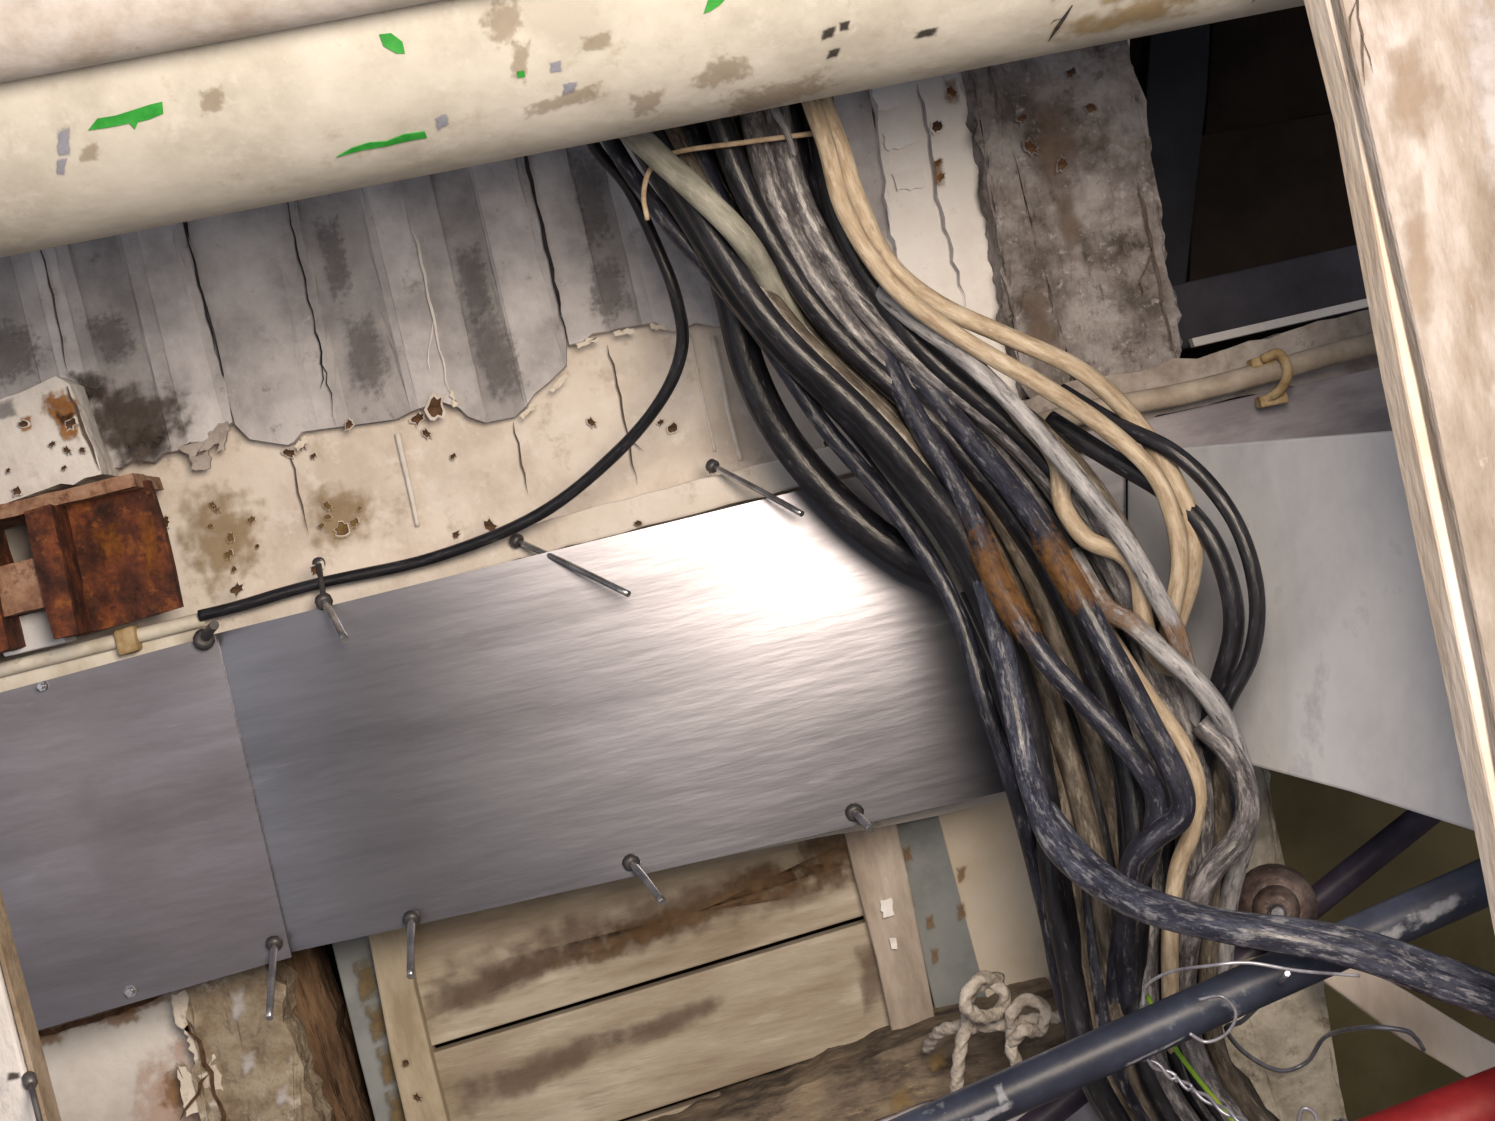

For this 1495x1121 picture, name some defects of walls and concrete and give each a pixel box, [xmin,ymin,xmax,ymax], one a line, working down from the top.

corrosion [0,392,80,440]
damp [70,373,190,466]
peeling [171,983,223,1117]